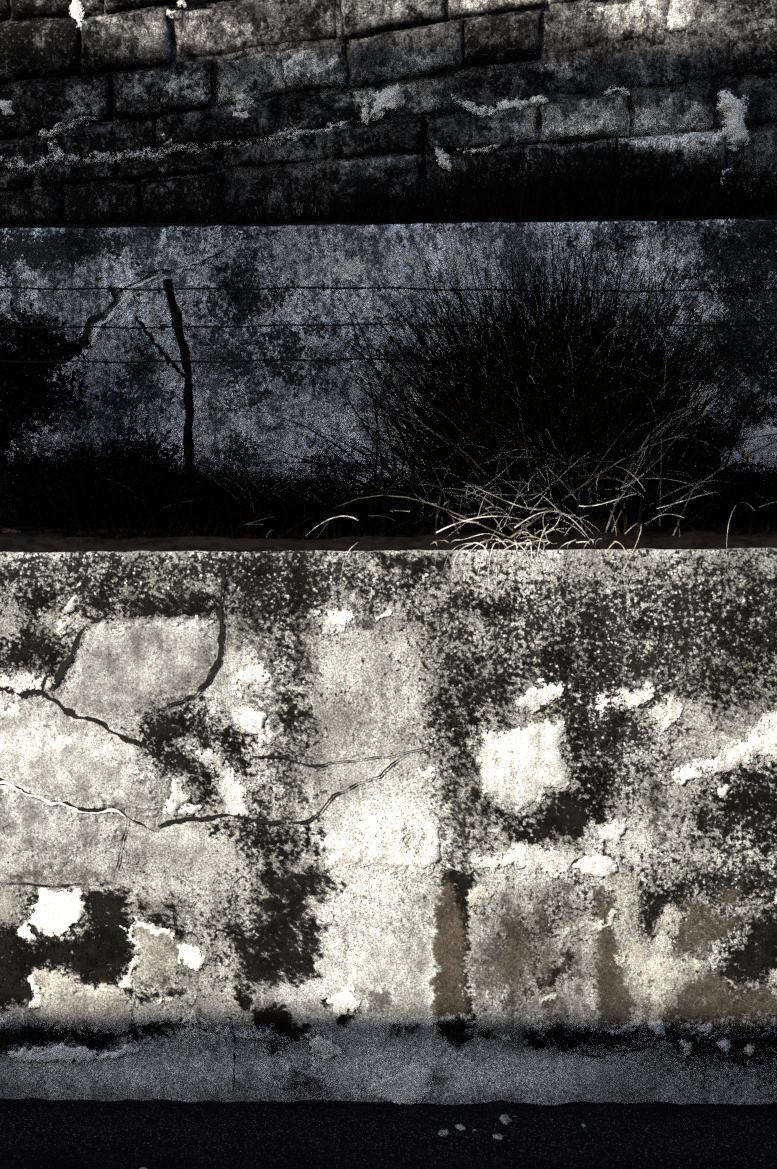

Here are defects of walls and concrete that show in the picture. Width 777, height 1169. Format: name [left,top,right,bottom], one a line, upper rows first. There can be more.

crack [61,234,257,369]
crack [0,569,226,764]
leakage [0,553,346,1057]
crack [0,745,435,880]
leakage [420,560,777,1069]
crack [5,881,85,889]
leakage [288,1070,320,1094]
leakage [390,1022,419,1038]